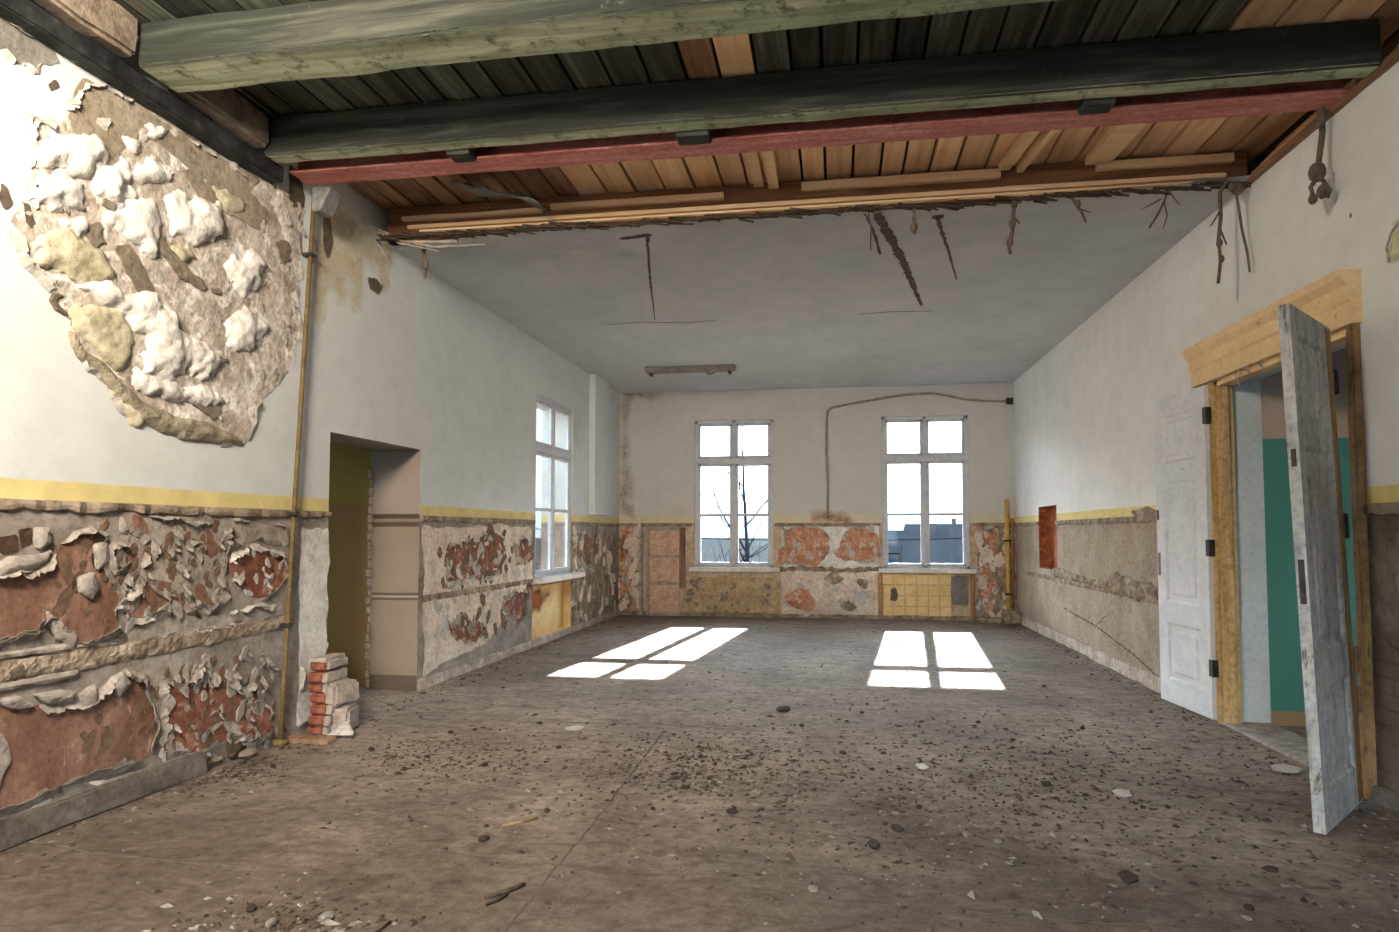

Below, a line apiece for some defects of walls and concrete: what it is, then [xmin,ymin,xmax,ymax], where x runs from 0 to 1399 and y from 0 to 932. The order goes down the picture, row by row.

flaking render [0,16,306,447]
water stain [1385,222,1399,264]
peeling [0,513,308,813]
flaking render [422,523,534,677]
flaking render [682,523,882,614]
spalling [1049,567,1159,602]